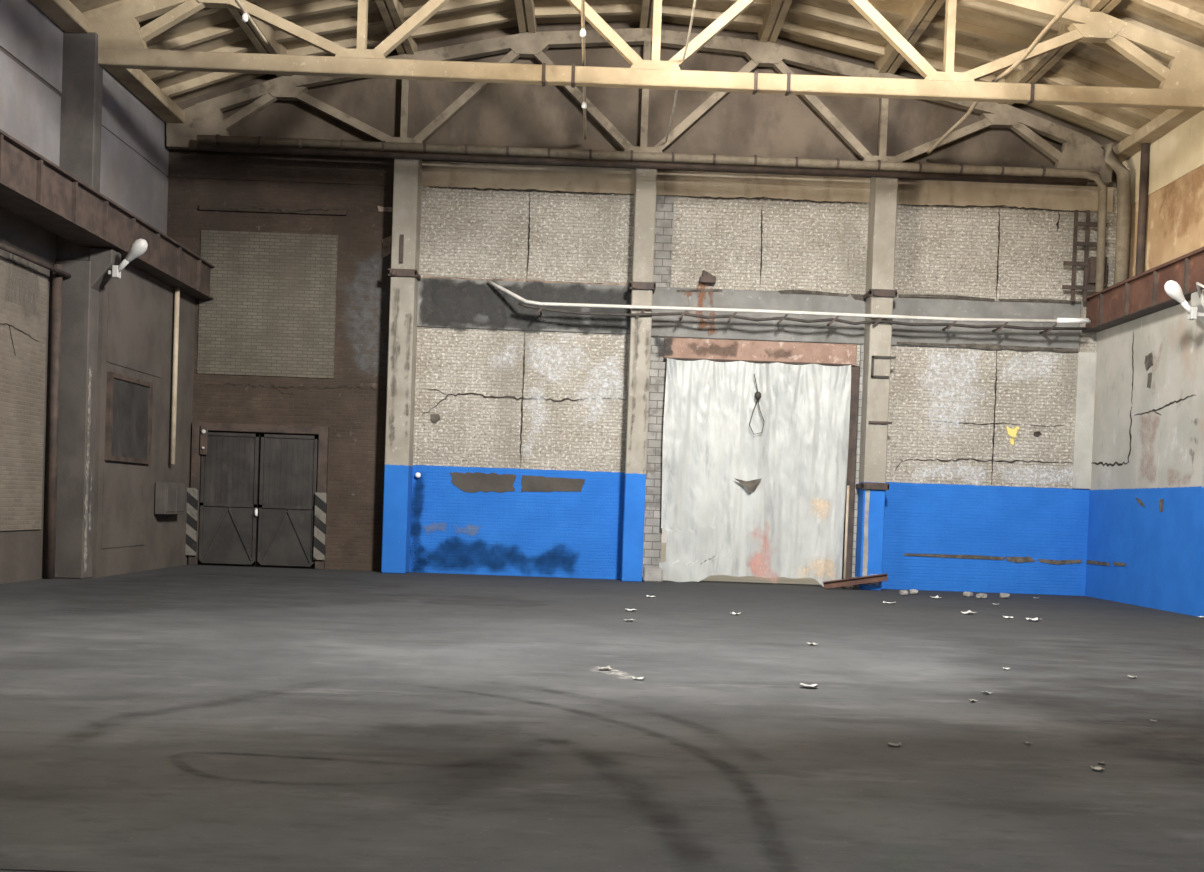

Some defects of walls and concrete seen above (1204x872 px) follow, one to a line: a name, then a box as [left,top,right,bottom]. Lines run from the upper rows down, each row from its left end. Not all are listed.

rust [687,283,715,333]
crack [422,333,627,468]
crack [895,332,1193,484]
peeling [450,472,585,493]
peeling [904,553,1126,566]